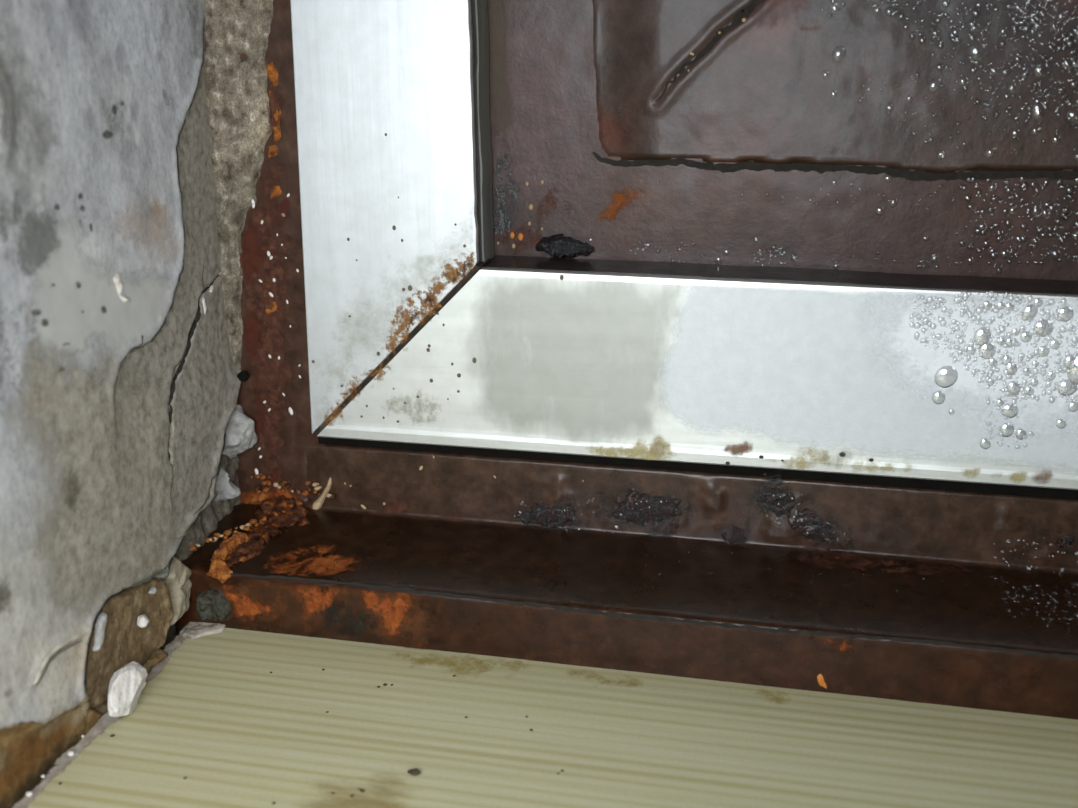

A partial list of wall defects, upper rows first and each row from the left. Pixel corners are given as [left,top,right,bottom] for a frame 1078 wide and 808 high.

damp [0,697,108,808]
spalling [34,577,174,709]
spalling [29,37,242,539]
crack [84,263,241,703]
rust [189,62,442,649]
rust [325,244,474,425]